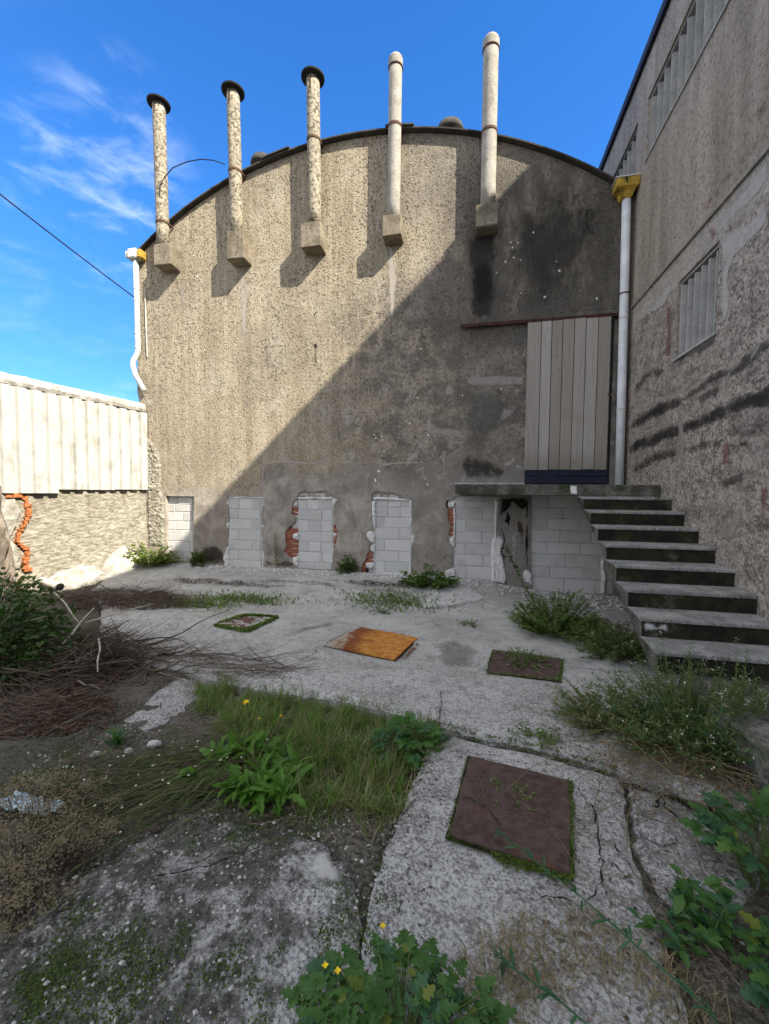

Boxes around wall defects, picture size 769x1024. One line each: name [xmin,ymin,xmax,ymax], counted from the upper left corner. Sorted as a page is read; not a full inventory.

leakage [470,234,497,316]
leakage [688,342,769,397]
leakage [630,387,769,460]
flaking render [292,491,336,515]
flaking render [1,493,33,572]
flaking render [285,528,299,558]
flaking render [362,550,374,572]